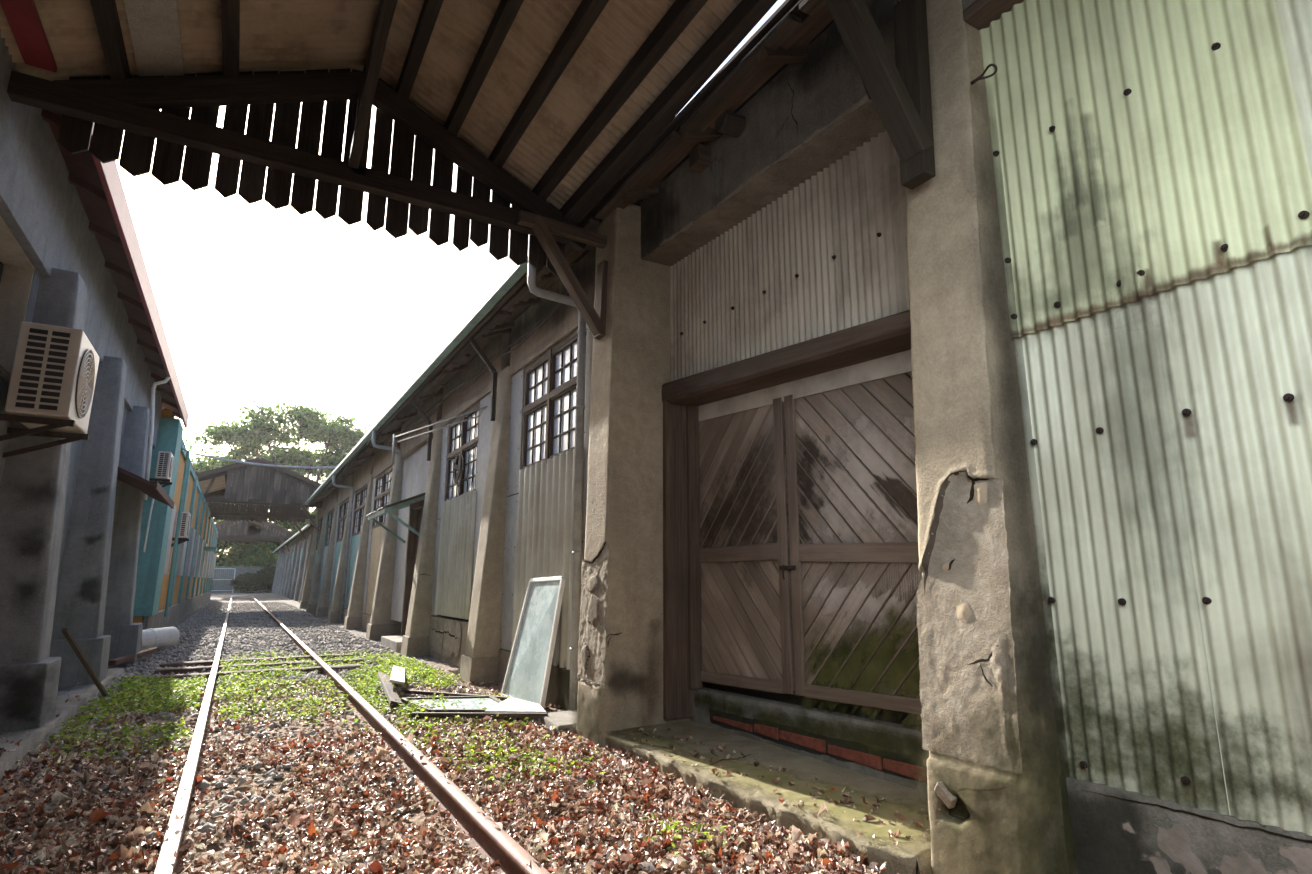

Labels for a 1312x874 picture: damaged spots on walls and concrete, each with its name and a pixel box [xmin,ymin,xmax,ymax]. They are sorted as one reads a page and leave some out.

rust [1013,237,1279,335]
water stain [700,448,777,562]
water stain [796,416,918,542]
spalling [709,471,1022,812]
peeling [1143,823,1312,874]